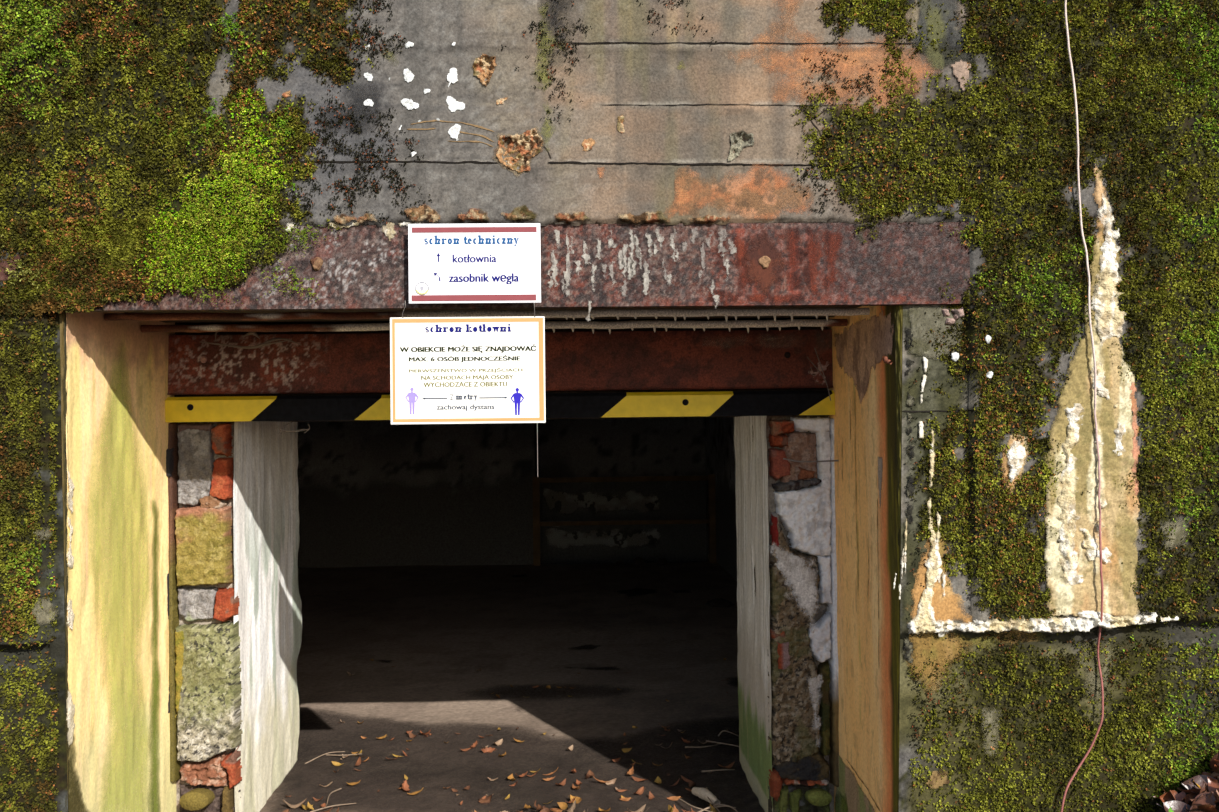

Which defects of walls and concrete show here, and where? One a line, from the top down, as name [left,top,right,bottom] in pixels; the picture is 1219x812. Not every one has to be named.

spalling [473,54,497,86]
spalling [494,126,544,176]
corrosion [670,168,812,293]
peeling [834,306,964,403]
spalling [906,394,915,460]
spalling [905,476,915,524]
spalling [767,423,832,802]